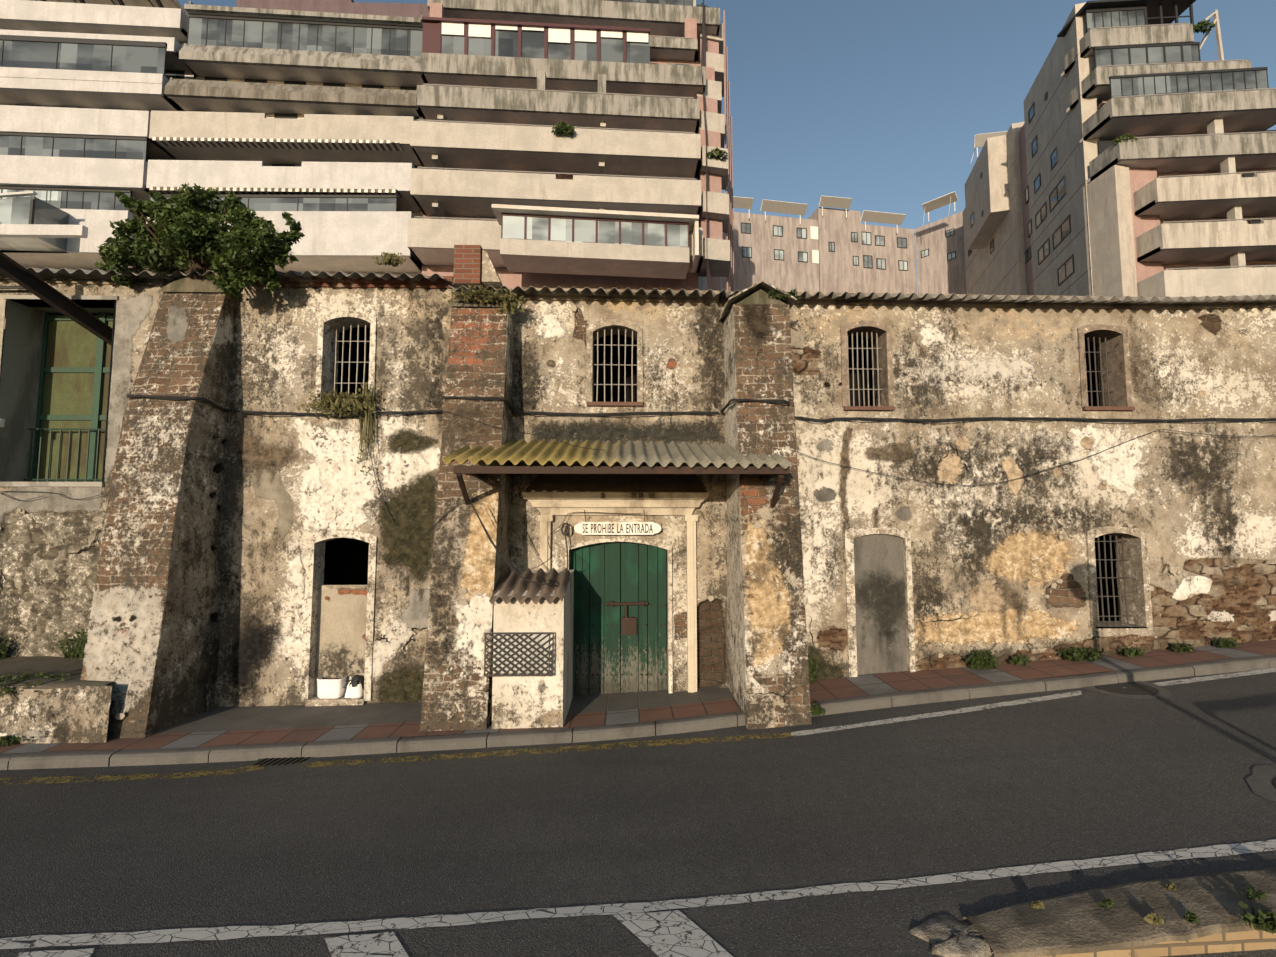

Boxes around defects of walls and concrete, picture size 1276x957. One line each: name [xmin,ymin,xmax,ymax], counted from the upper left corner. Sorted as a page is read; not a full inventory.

damp [1171,429,1231,487]
spalling [673,596,728,688]
peeling [740,474,792,668]
peeling [914,526,1161,671]
damp [1211,507,1242,566]